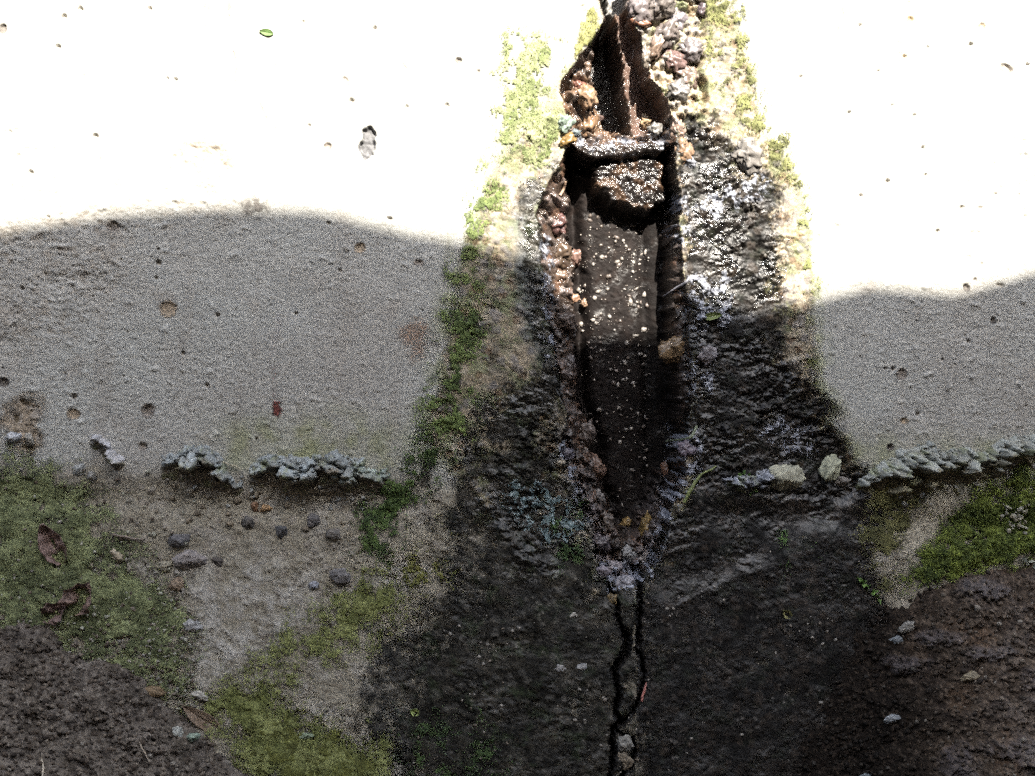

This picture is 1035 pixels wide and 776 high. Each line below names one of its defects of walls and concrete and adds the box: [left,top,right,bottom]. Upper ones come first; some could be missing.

water stain [342,107,893,776]
crack [606,565,648,776]
spalling [428,0,862,607]